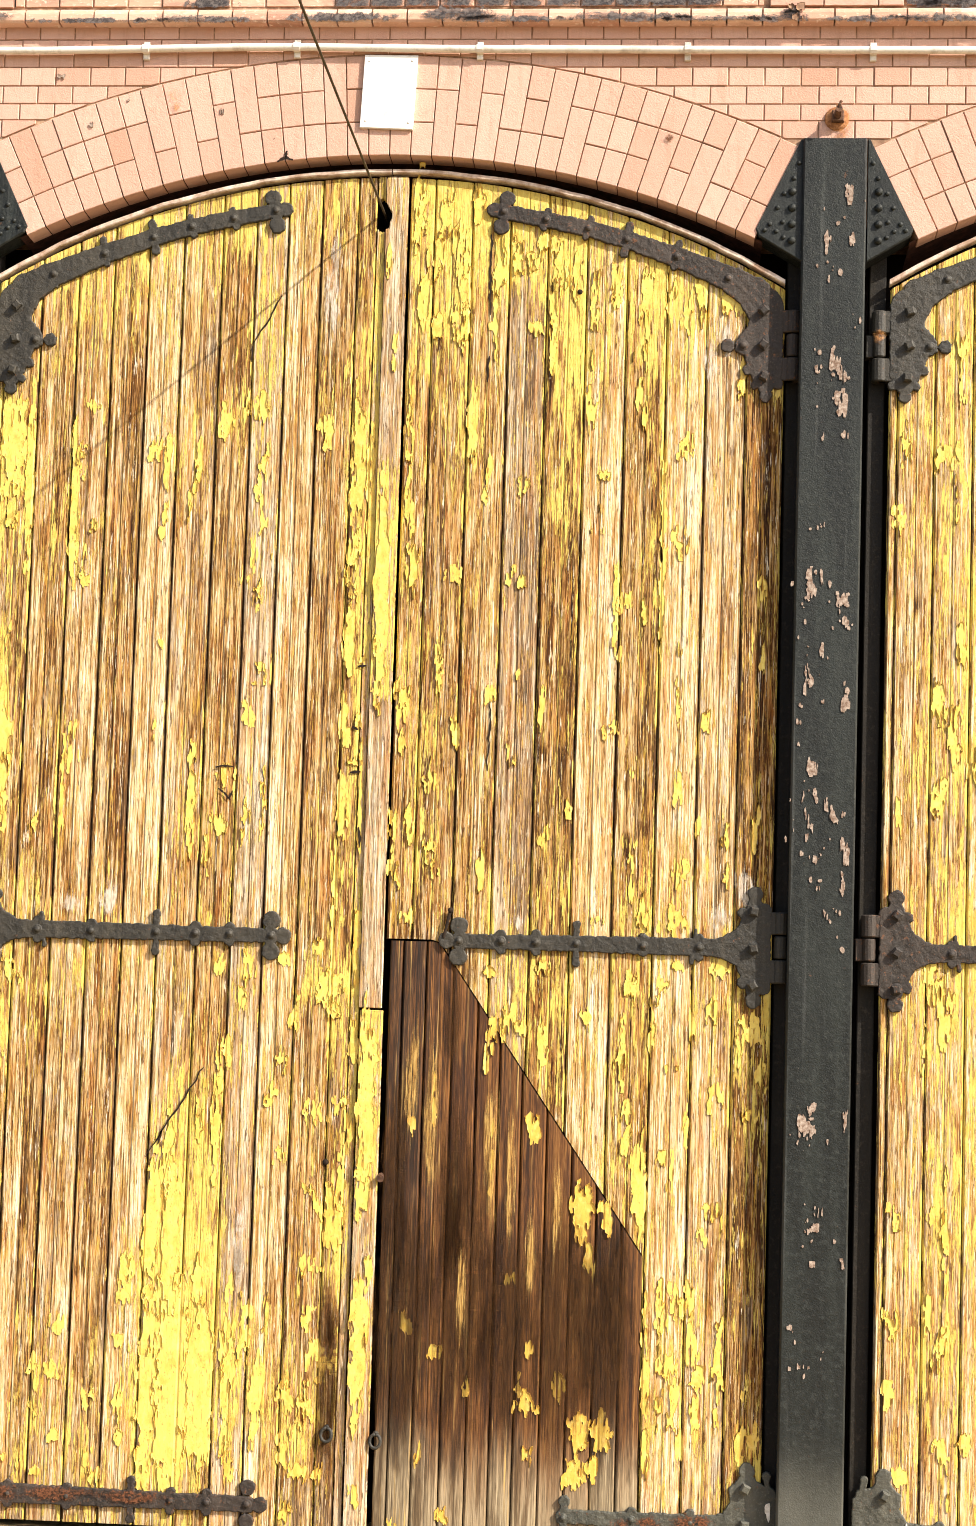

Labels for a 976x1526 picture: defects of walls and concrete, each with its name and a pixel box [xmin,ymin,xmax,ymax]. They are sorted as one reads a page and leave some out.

peeling [412,162,747,436]
peeling [0,375,37,575]
peeling [278,330,421,1279]
peeling [784,566,853,953]
crack [145,1067,204,1157]
peeling [483,1002,549,1075]
peeling [80,1103,373,1493]
peeling [569,1178,613,1278]
peeling [613,959,760,1478]
rust [0,1485,174,1504]
peeling [511,1340,614,1491]
rust [610,1513,712,1526]